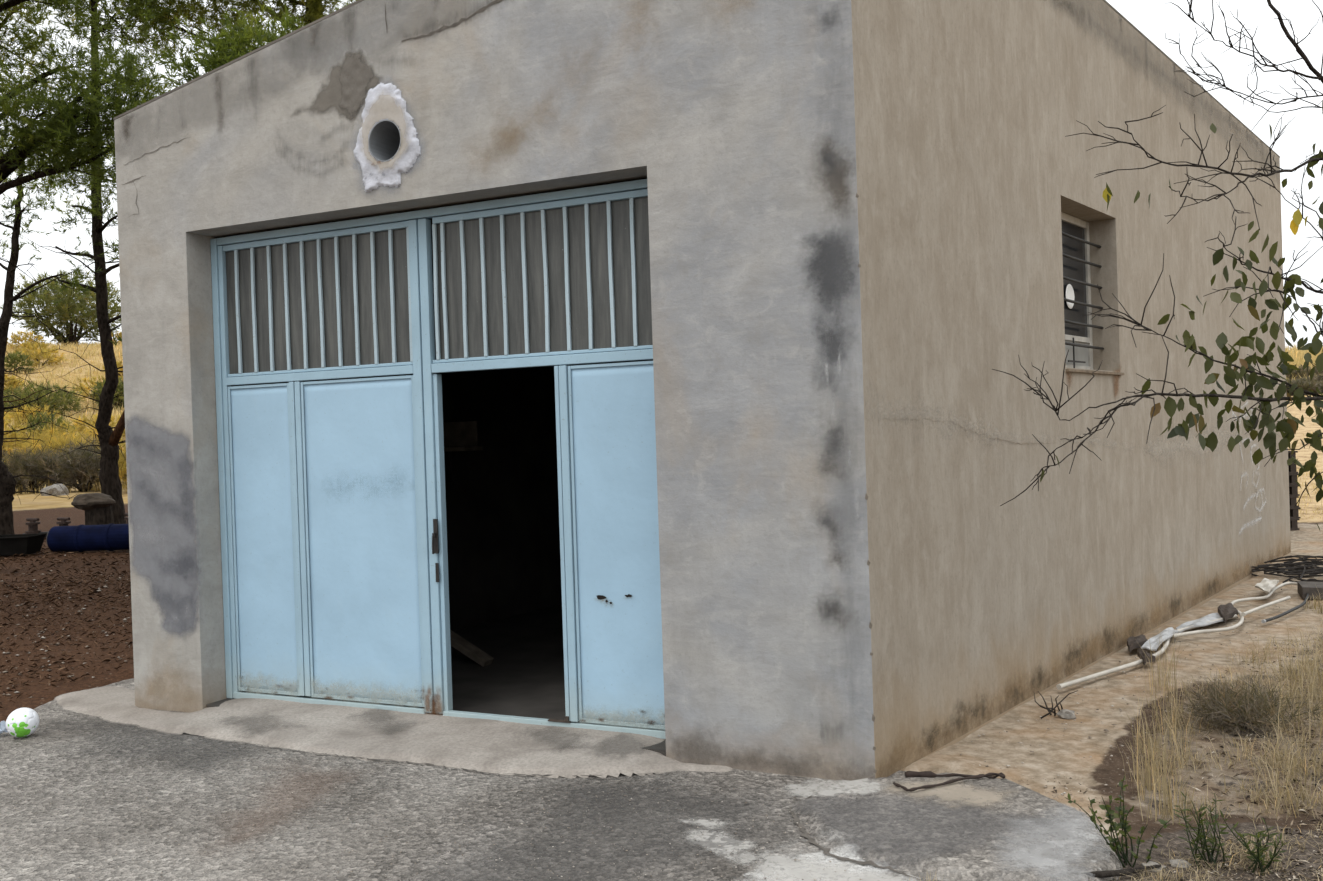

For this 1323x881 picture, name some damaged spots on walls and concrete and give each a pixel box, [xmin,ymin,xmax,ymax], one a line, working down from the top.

crack [385,0,502,42]
spalling [297,52,379,119]
leakage [822,145,847,204]
leakage [809,239,851,307]
corrosion [425,690,441,715]